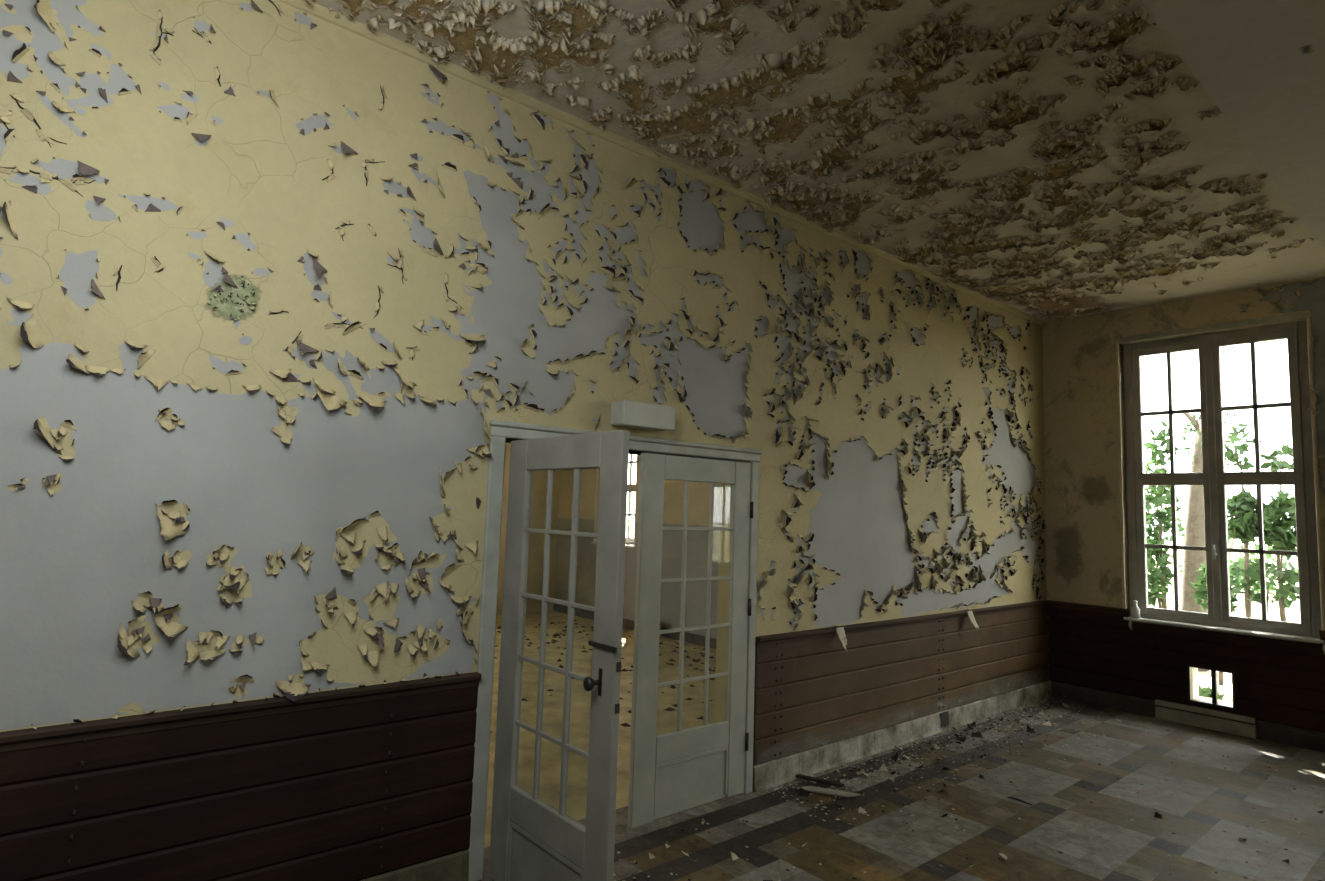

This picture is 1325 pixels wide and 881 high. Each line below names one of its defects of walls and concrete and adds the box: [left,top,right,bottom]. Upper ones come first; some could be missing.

peeling [0,0,142,137]
peeling [239,0,263,13]
peeling [294,0,317,30]
mould [207,275,259,321]
peeling [328,0,1316,652]
peeling [0,82,753,730]